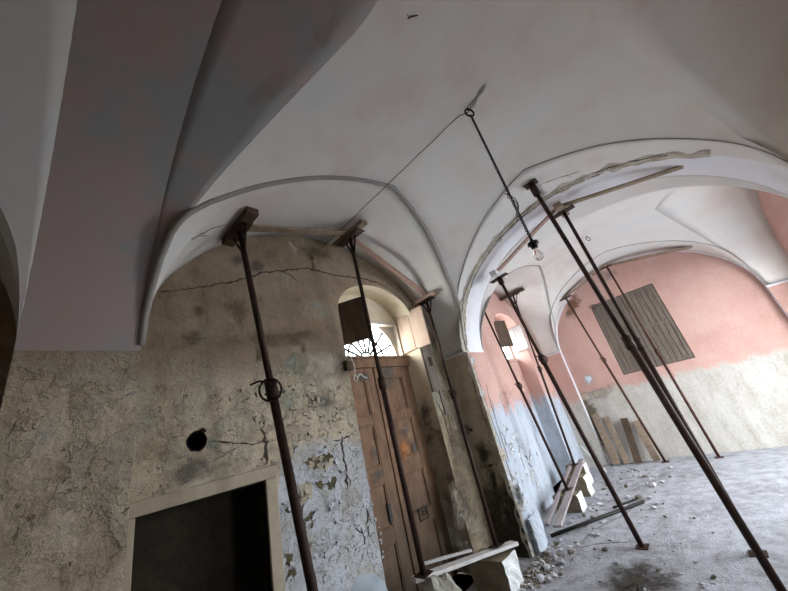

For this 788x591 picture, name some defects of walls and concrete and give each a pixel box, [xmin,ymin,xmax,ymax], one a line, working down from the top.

crack [193,426,268,471]
crack [160,267,405,303]
peeling [274,371,384,583]
spalling [459,150,710,558]